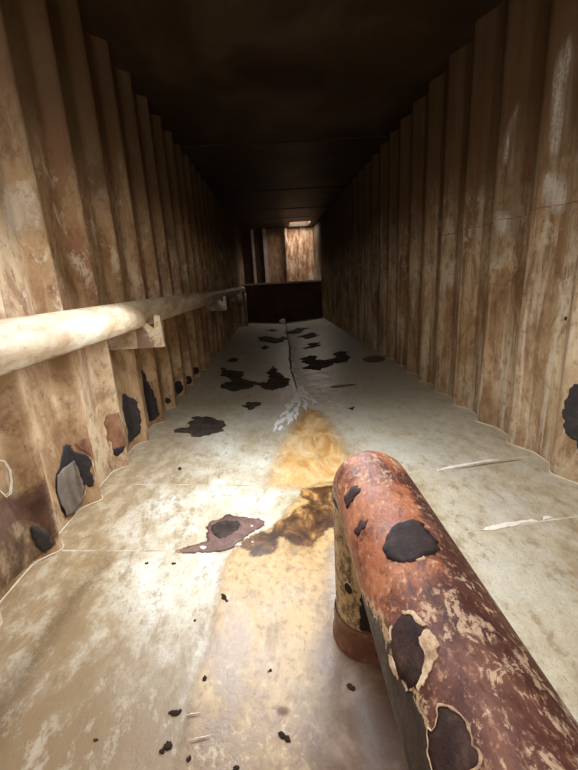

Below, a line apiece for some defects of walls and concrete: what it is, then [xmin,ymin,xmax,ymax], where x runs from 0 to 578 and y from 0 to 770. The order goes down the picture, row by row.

efflorescence [544,174,567,210]
peeling [219,358,291,391]
crack [283,324,298,392]
peeling [257,328,351,370]
peeling [104,367,199,469]
peeling [173,416,228,437]
peeling [562,384,578,449]
peeling [55,436,96,518]
peeling [175,514,265,554]
rust [175,409,347,770]
peeling [405,629,440,692]